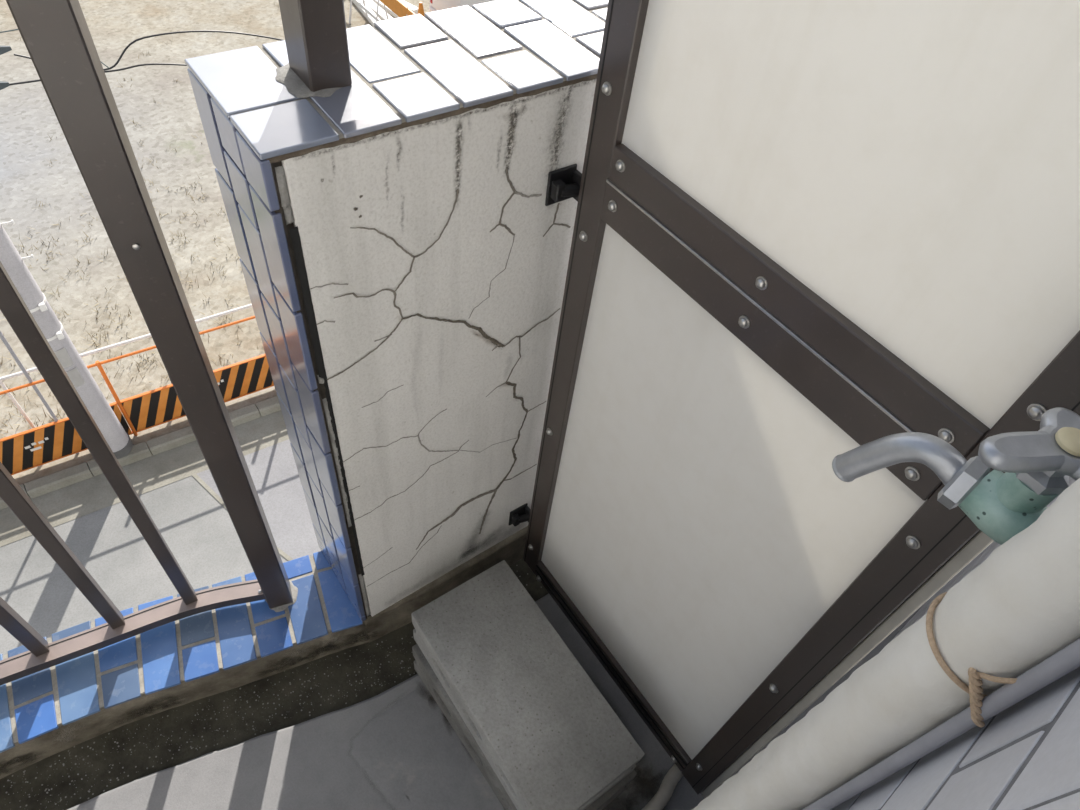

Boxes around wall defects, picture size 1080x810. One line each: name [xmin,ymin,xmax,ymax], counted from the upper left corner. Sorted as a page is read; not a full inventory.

leakage [446,83,586,195]
crack [310,168,571,587]